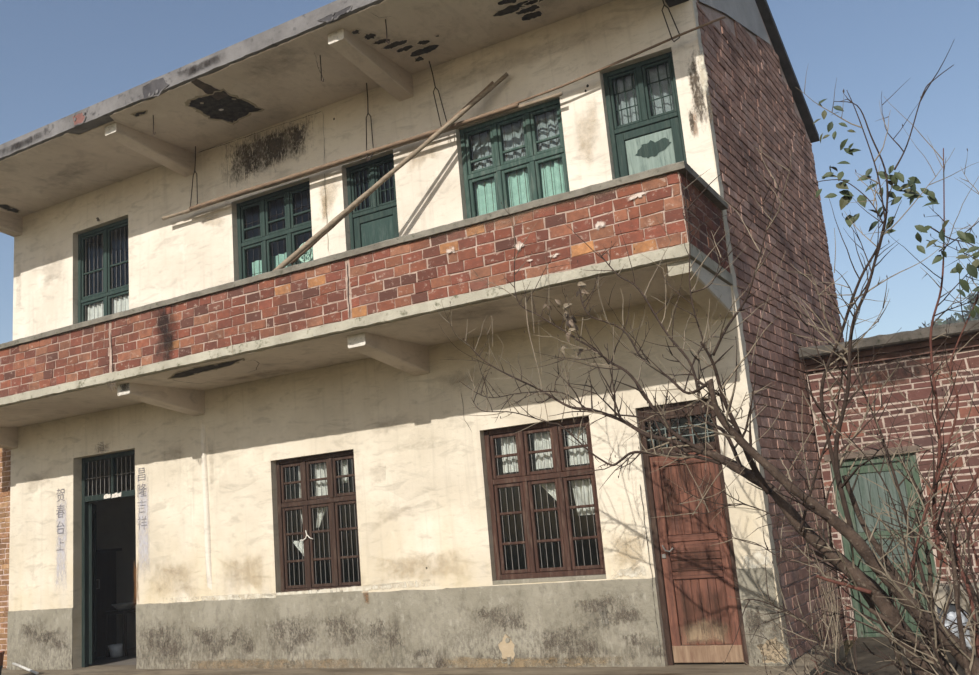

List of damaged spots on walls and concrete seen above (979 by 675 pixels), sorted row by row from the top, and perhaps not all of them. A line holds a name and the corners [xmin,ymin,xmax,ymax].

spalling [491,0,544,21]
spalling [350,28,441,63]
spalling [184,79,265,125]
leakage [225,121,309,180]
spalling [168,358,245,384]